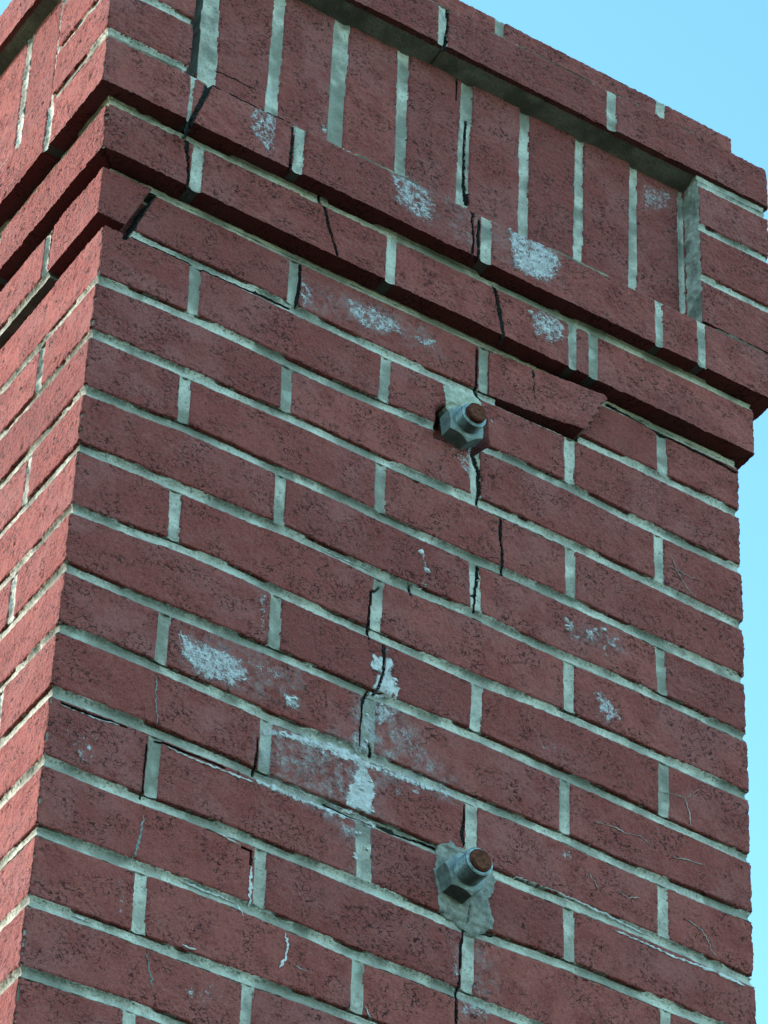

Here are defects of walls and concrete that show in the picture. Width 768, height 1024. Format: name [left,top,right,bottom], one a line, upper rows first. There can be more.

crack [317,197,338,256]
efflorescence [392,173,436,222]
crack [462,122,481,262]
efflorescence [508,228,561,283]
efflorescence [348,299,436,349]
crack [473,286,505,401]
efflorescence [528,310,565,343]
crack [470,454,504,612]
efflorescence [177,631,279,687]
crack [359,588,386,758]
efflorescence [166,648,461,836]
crack [454,906,492,1024]